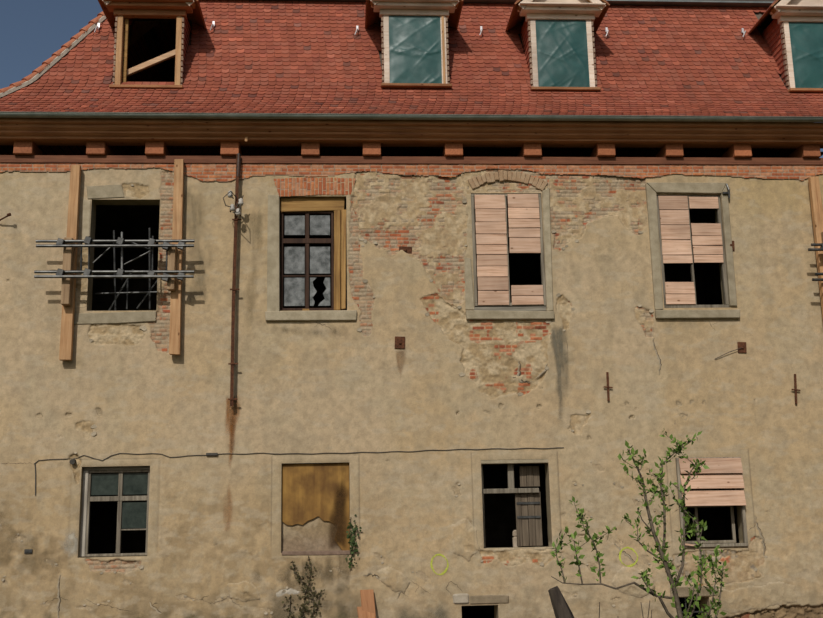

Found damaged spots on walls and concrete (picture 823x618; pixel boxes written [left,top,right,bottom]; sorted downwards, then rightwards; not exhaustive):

spalling [88,171,174,353]
spalling [351,164,648,414]
corrosion [227,400,238,458]
spalling [480,548,574,567]